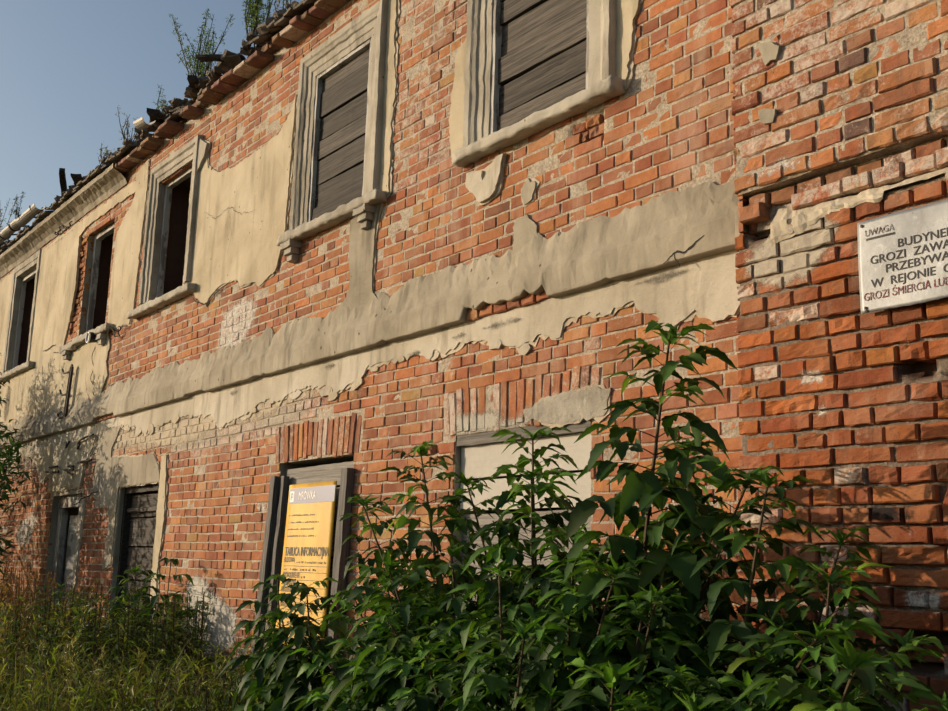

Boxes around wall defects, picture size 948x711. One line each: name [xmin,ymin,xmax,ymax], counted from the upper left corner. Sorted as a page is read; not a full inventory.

flaking render [182,94,298,307]
flaking render [342,0,401,311]
flaking render [465,153,507,206]
flaking render [512,178,541,254]
crack [663,235,704,267]
flaking render [770,167,948,247]
flaking render [1,250,740,632]